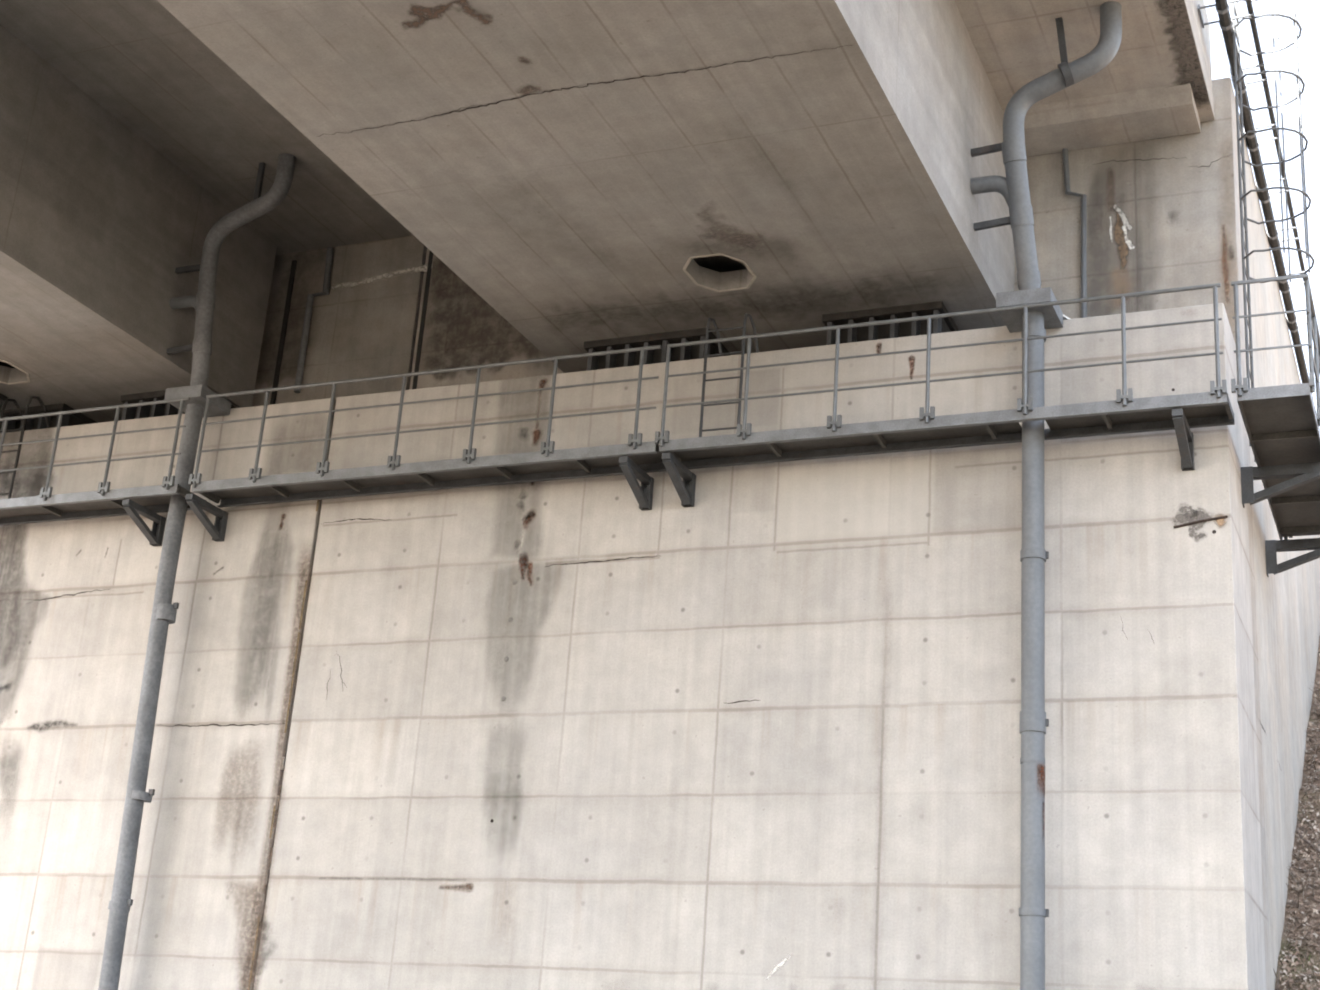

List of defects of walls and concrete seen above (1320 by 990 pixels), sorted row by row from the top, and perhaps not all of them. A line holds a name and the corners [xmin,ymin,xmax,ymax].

peeling [403,0,491,28]
crack [317,45,852,137]
spalling [1173,506,1228,539]
corrosion [519,557,532,585]